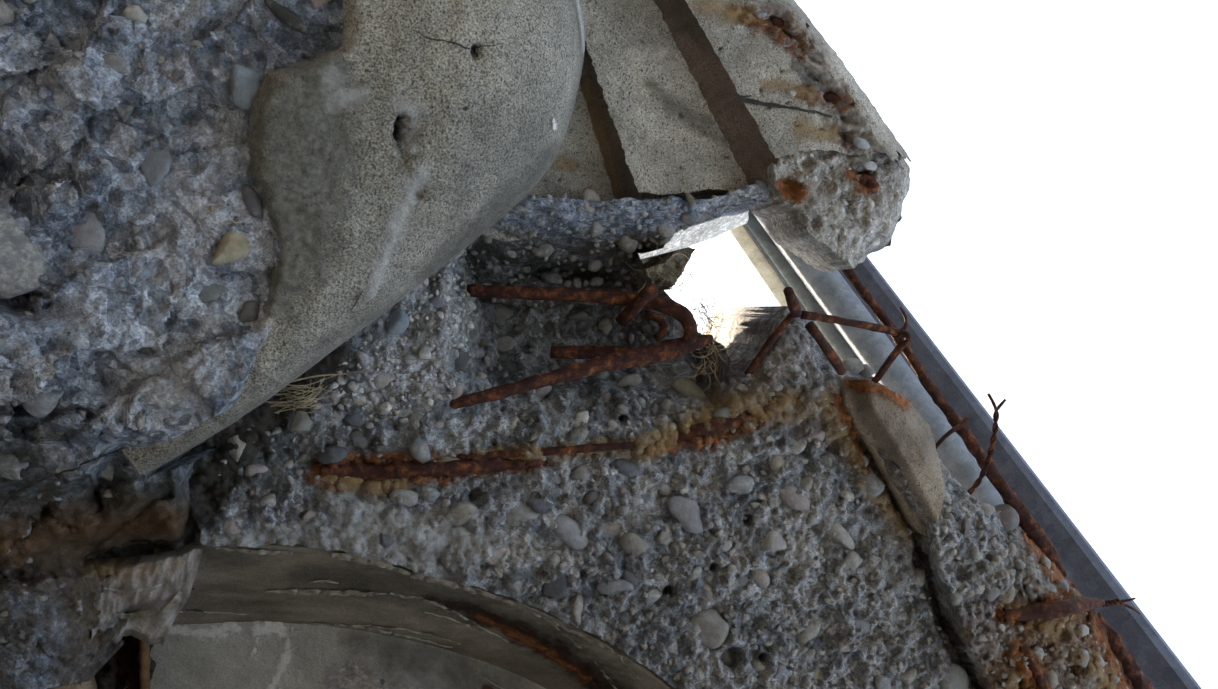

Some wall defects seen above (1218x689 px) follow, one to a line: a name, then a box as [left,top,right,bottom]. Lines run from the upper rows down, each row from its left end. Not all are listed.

rust [699,1,814,58]
rust [774,177,809,204]
spalling [449,281,714,409]
rust [307,446,547,496]
spalling [321,441,645,481]
rust [627,392,801,458]
spalling [676,414,755,444]
rust [820,380,917,538]
peeling [266,580,508,643]
peeling [326,553,648,689]
crack [905,521,983,689]
rust [994,532,1133,689]